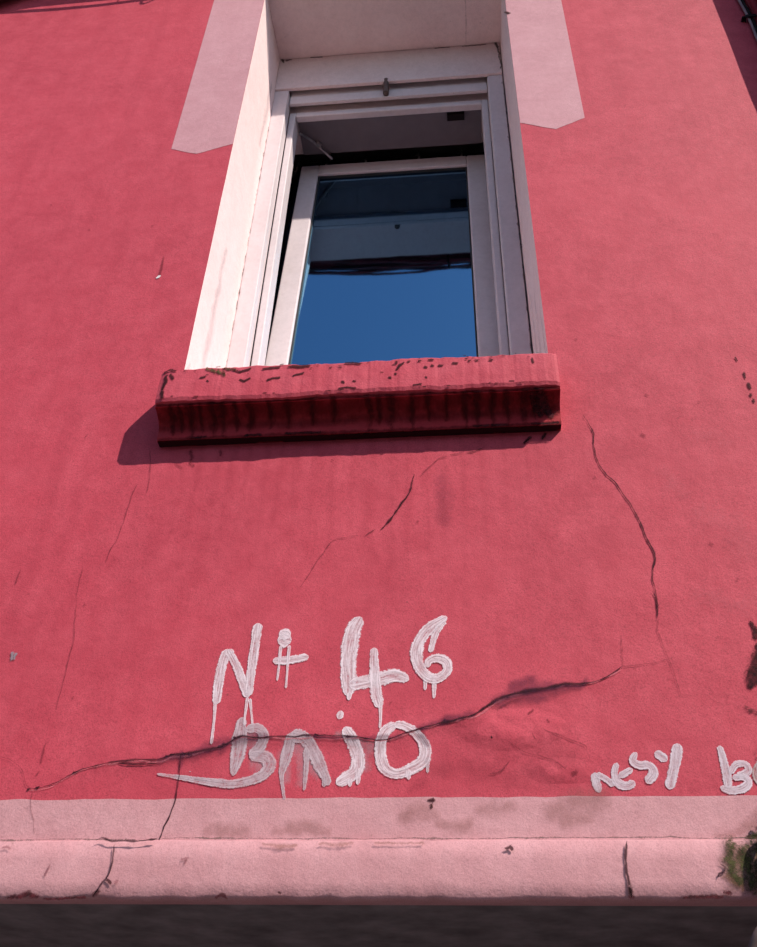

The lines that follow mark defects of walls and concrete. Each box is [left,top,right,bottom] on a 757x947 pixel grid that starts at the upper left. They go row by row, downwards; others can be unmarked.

peeling [263,364,310,393]
peeling [388,353,516,387]
crack [365,474,415,536]
crack [583,415,659,619]
damp [746,621,757,688]
crack [2,664,757,899]